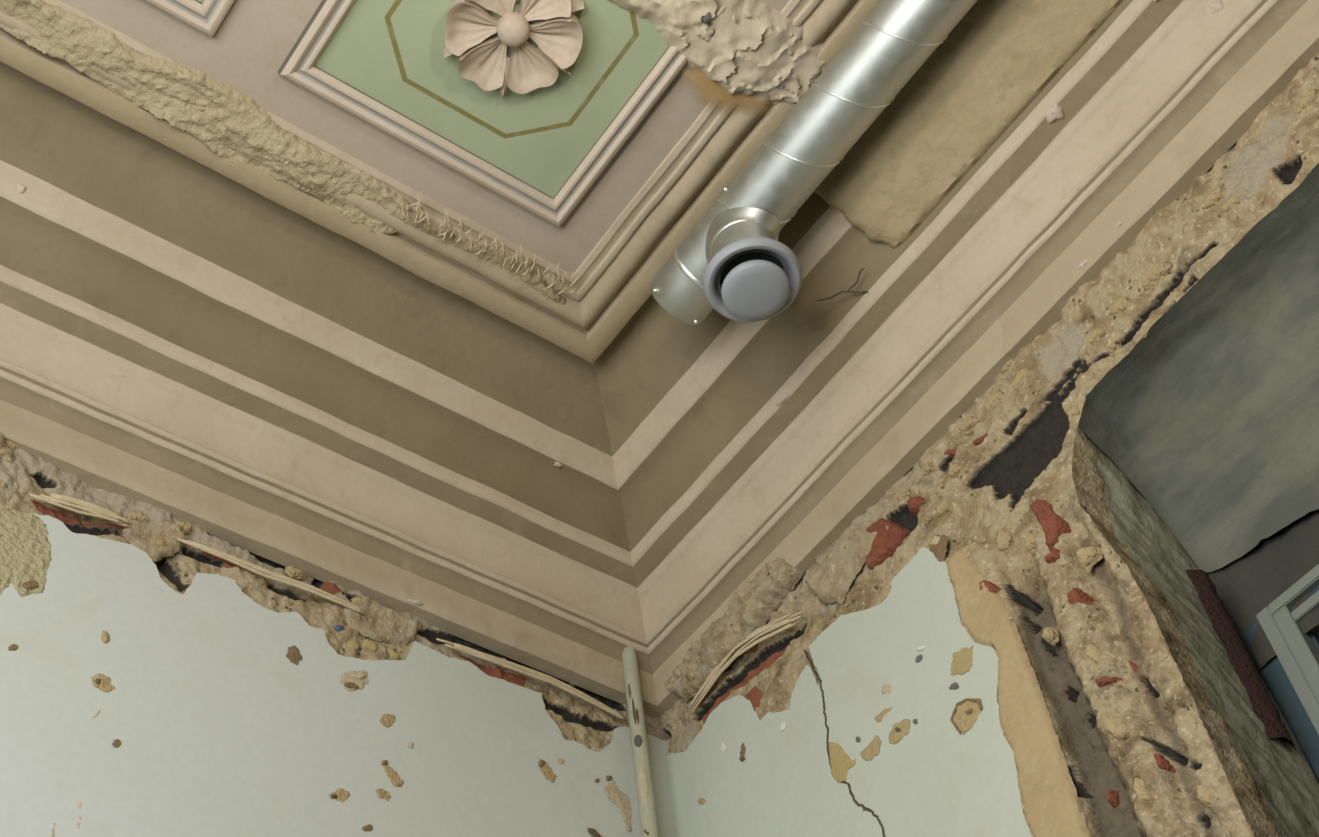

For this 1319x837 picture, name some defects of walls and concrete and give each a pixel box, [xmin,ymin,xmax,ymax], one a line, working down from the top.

flaking render [644,53,1319,837]
flaking render [0,440,639,752]
peeling [329,788,350,803]
peeling [376,760,403,801]
peeling [538,758,564,782]
peeling [595,763,649,835]
crack [804,650,886,837]